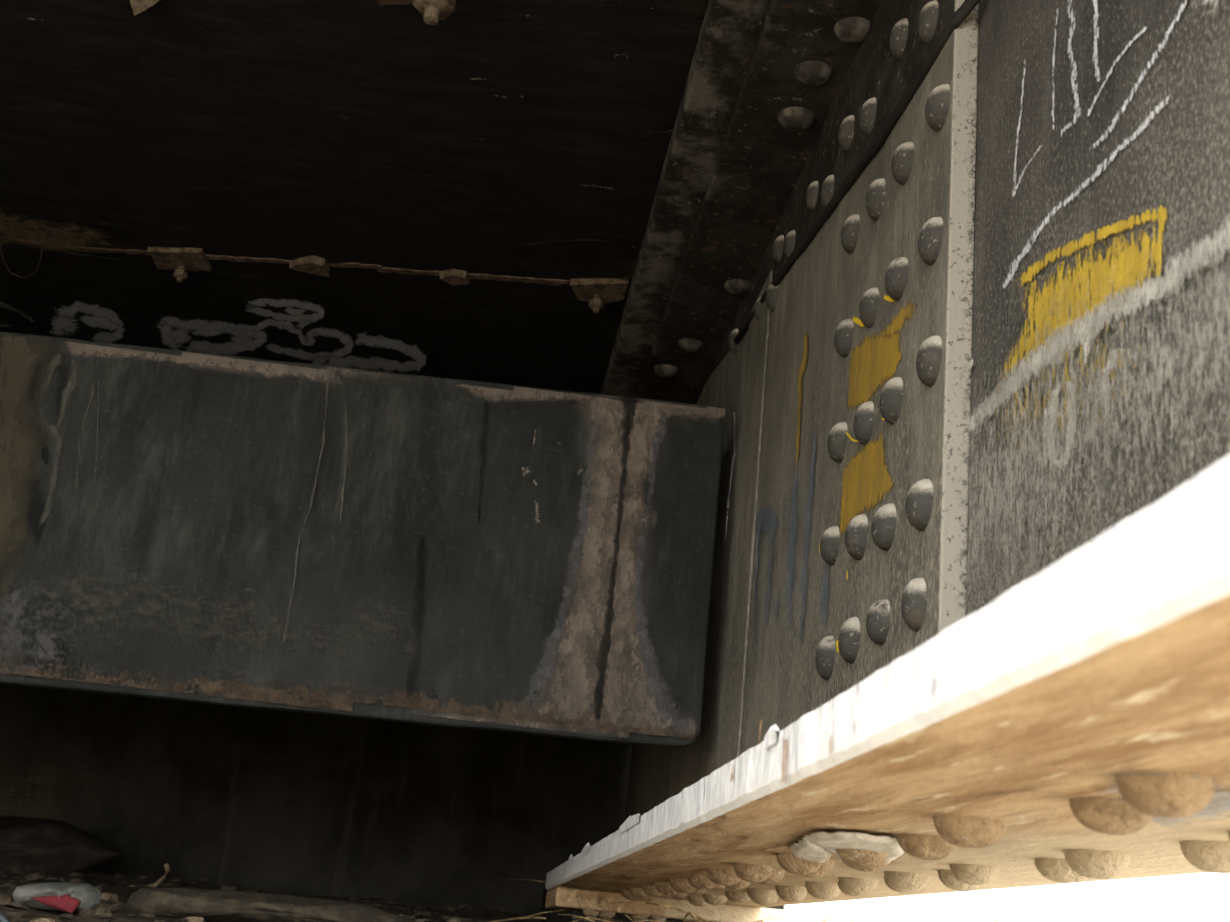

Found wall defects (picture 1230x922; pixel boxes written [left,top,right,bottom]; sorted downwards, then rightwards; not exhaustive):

rust [0,209,115,253]
water stain [0,334,429,694]
rust [0,397,721,740]
water stain [453,383,610,705]
crack [594,397,638,721]
water stain [632,400,736,736]